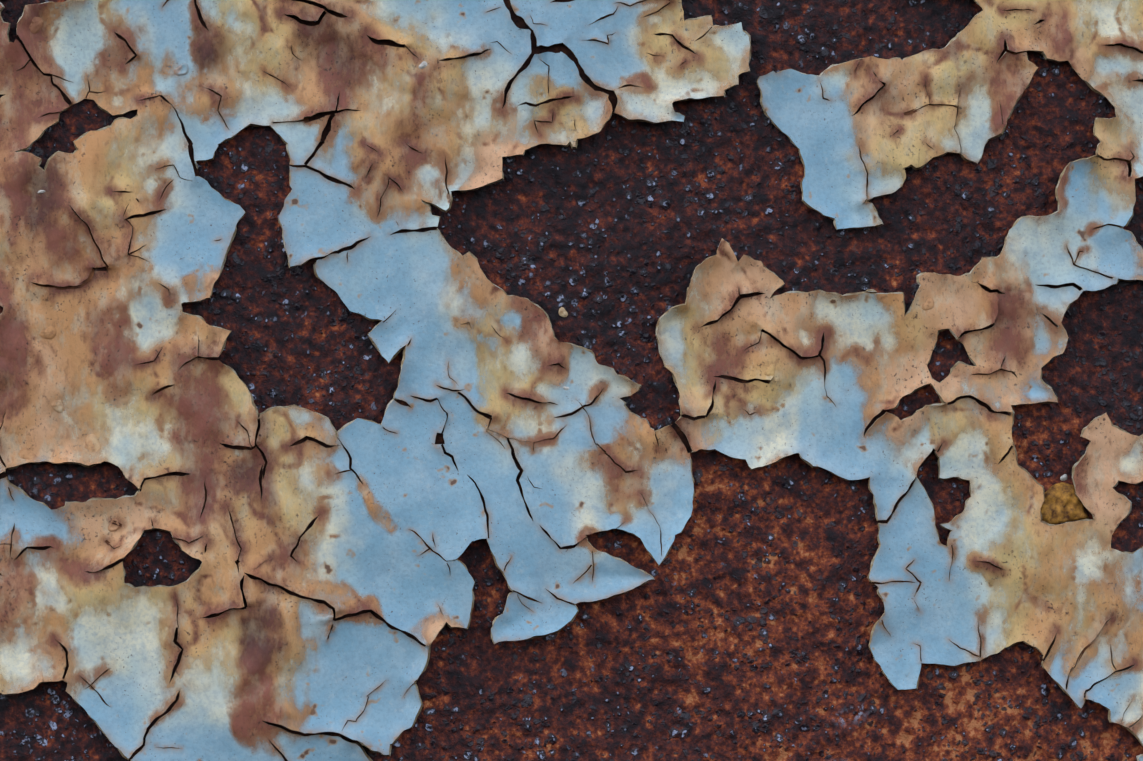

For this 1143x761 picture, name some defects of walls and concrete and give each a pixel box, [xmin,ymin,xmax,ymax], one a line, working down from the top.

crack [31,95,200,290]
crack [273,95,437,265]
crack [368,0,712,132]
peeling [757,58,1031,230]
peeling [963,0,1143,404]
crack [1037,224,1121,290]
corrosion [0,0,548,761]
crack [220,419,363,499]
peeling [0,0,751,761]
crack [390,368,662,609]
corrosion [364,0,1143,761]
crack [129,472,425,761]